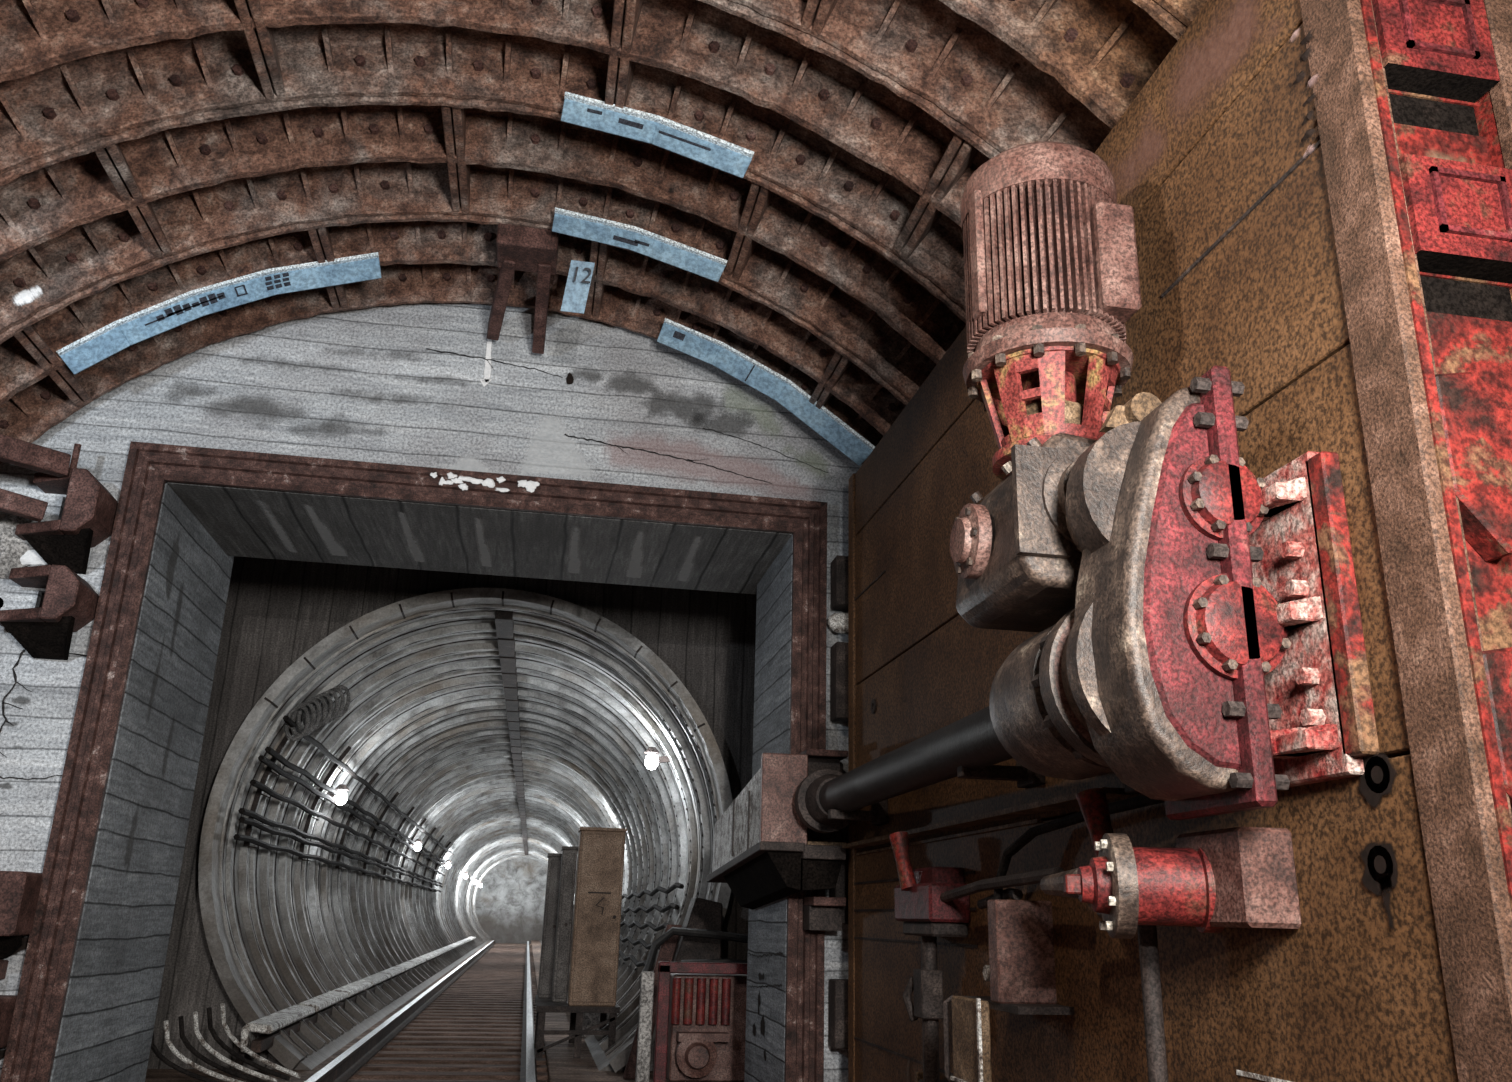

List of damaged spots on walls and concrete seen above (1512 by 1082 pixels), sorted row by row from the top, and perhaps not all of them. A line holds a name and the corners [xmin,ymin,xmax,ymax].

damp [480,339,492,387]
damp [220,400,279,416]